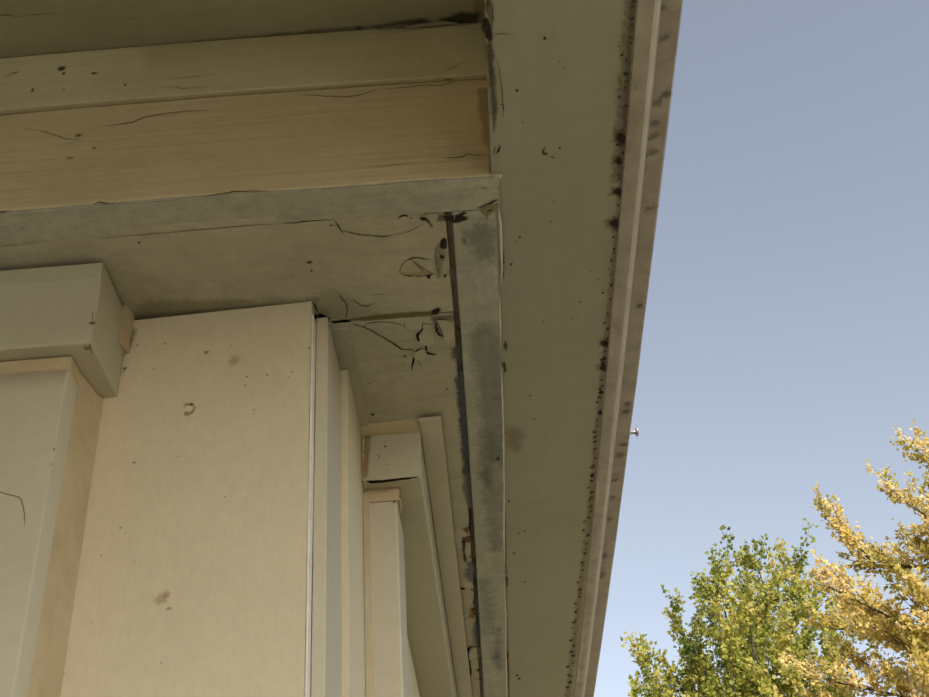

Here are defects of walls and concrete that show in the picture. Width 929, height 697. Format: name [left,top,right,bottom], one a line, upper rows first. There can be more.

crack [107,110,201,126]
leakage [488,62,497,125]
crack [99,213,440,239]
crack [335,294,436,371]
leakage [455,344,475,549]
crack [367,476,417,484]
leakage [465,562,483,674]